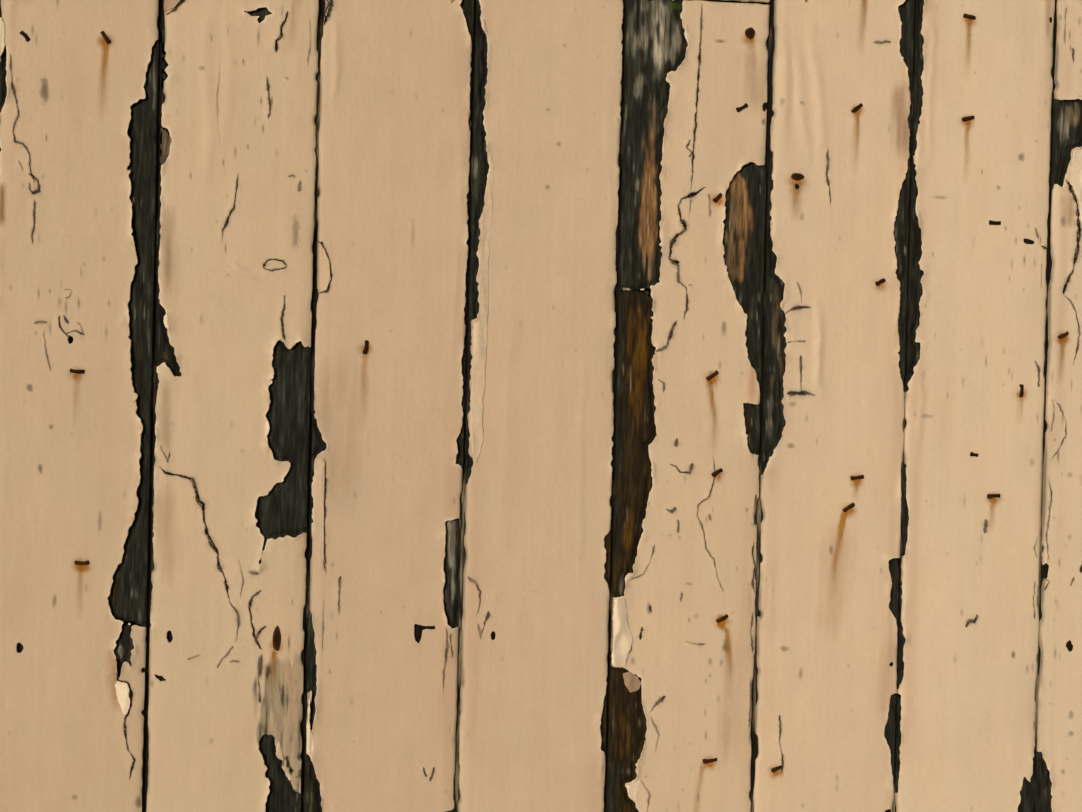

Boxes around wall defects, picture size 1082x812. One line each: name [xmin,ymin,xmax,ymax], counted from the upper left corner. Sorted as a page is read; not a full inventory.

peeling [108,29,182,717]
crack [159,452,266,703]
peeling [259,597,322,812]
peeling [255,340,327,570]
peeling [450,0,494,493]
peeling [600,0,691,812]
crack [656,7,705,352]
peeling [723,159,787,475]
corrosion [834,508,853,566]
peeling [893,0,924,392]
peeling [1018,741,1052,812]
peeling [1051,96,1082,224]